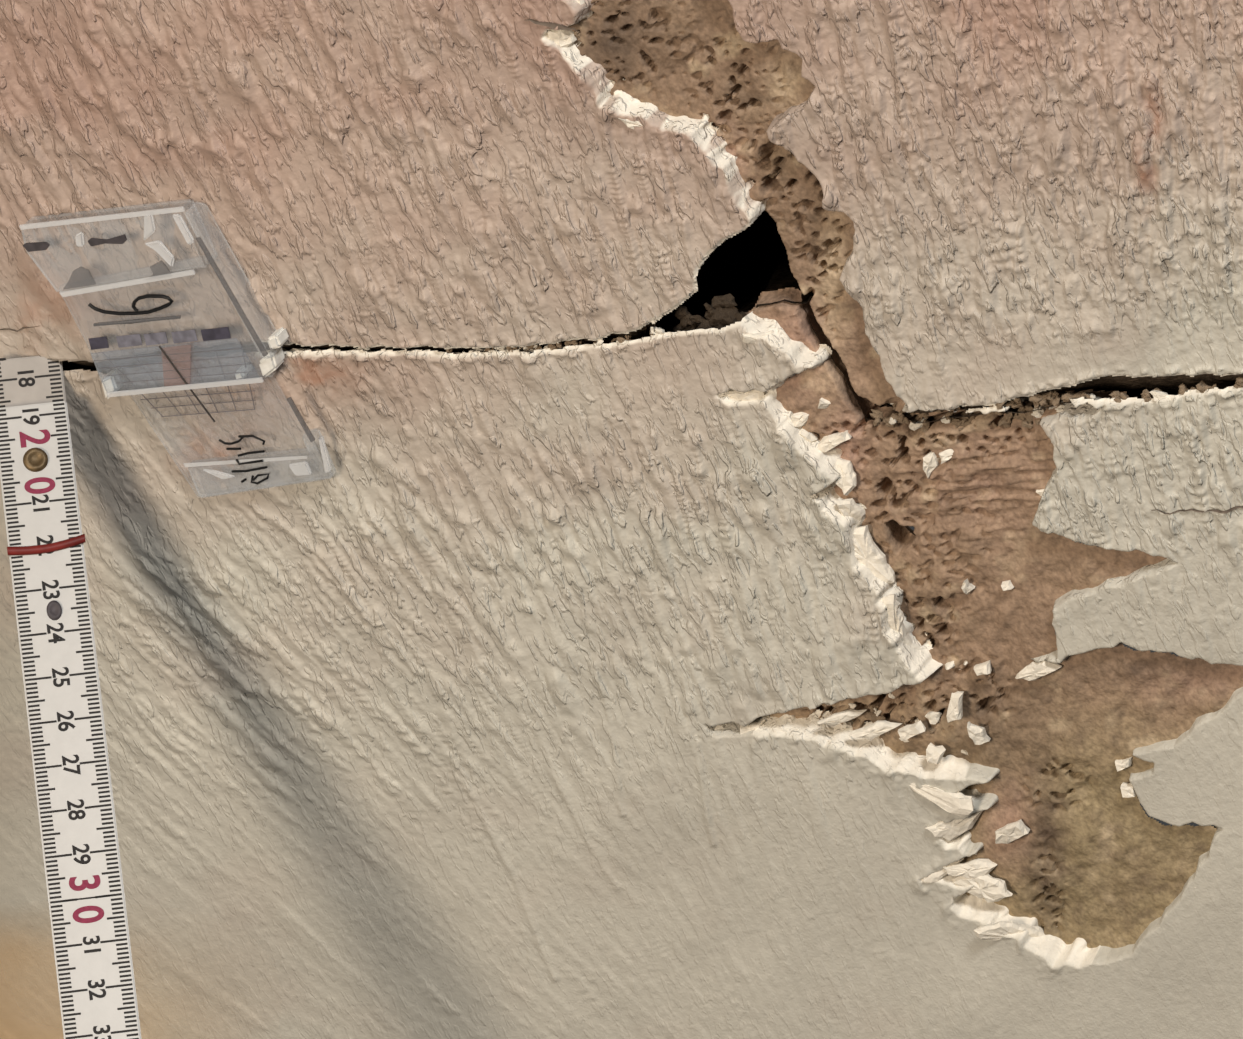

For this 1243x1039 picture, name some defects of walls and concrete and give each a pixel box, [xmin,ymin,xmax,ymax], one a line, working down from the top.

crack [62,320,665,374]
crack [801,293,1243,424]
spalling [548,0,1243,948]